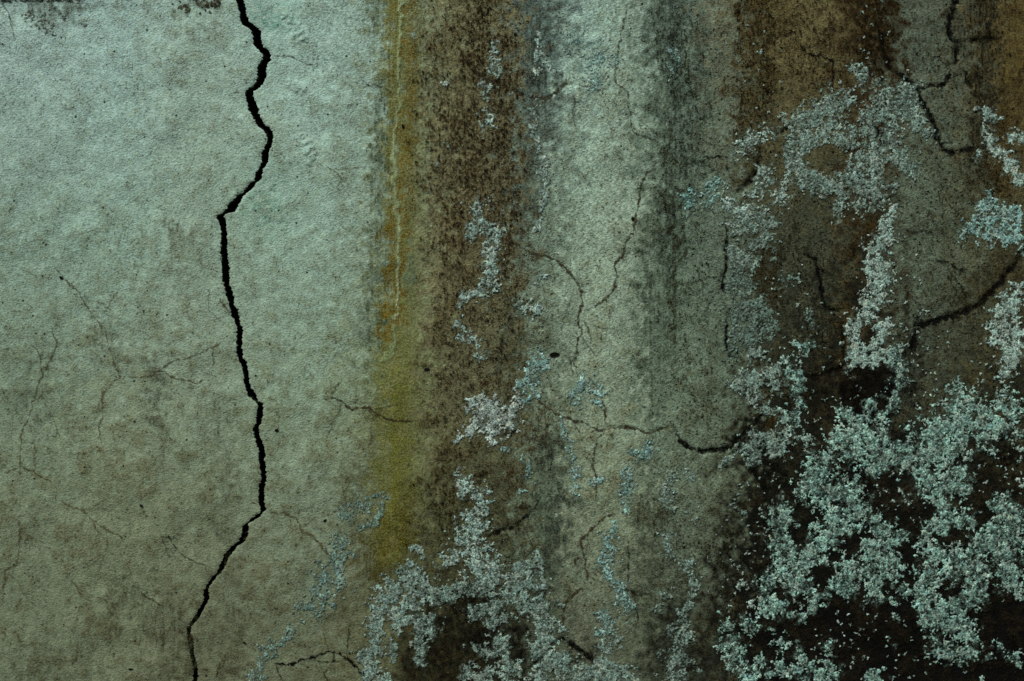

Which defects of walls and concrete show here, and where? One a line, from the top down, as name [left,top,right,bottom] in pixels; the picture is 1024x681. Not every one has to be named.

crack [56,0,346,681]
corrosion [355,0,546,581]
leakage [362,0,558,435]
leakage [636,0,718,424]
leakage [725,0,901,172]
crack [791,26,843,101]
leakage [636,217,1024,681]
crack [871,120,884,144]
crack [875,0,1019,156]
leakage [905,0,1023,337]
crack [911,255,1021,353]
leakage [396,579,530,681]